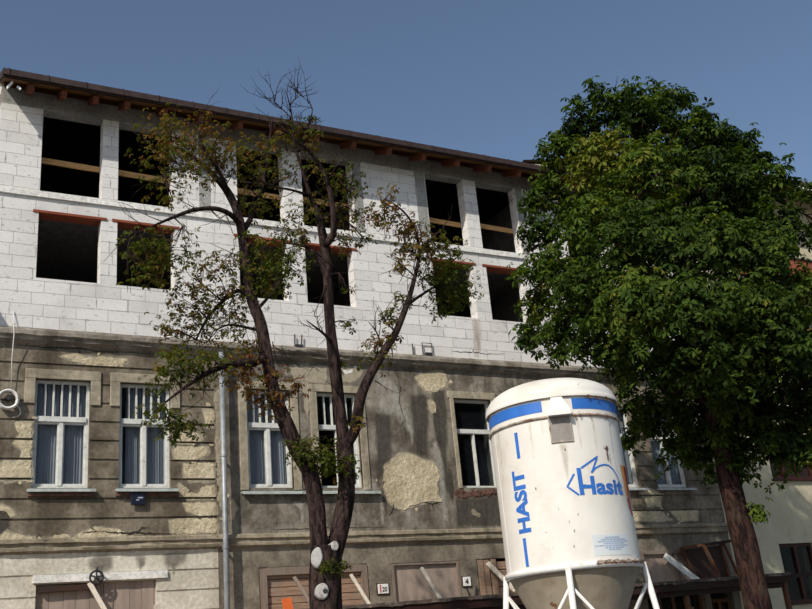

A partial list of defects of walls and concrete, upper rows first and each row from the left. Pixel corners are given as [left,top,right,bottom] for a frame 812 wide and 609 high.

peeling [59,352,129,367]
peeling [415,370,453,414]
peeling [168,389,222,535]
peeling [376,452,454,512]
peeling [0,503,17,517]
crack [83,527,170,535]